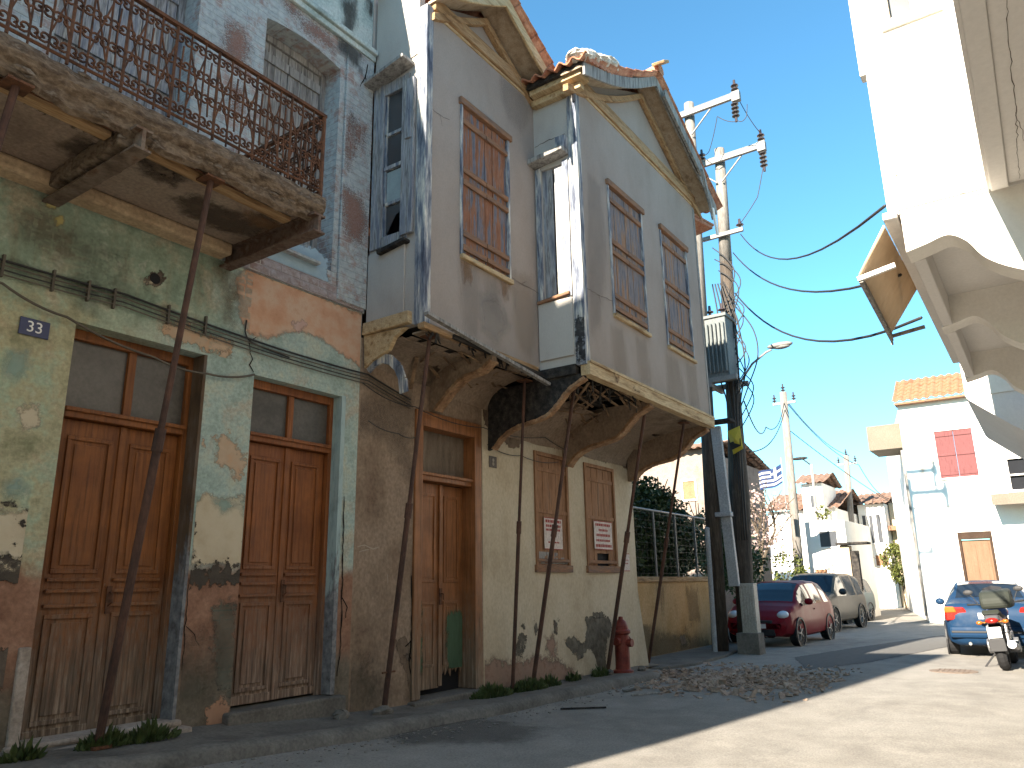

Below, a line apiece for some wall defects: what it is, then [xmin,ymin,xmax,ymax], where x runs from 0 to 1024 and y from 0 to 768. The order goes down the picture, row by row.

crack [1006,8,1024,179]
flaking render [344,113,370,173]
damp [138,159,273,236]
flaking render [342,184,369,248]
peeling [160,322,233,358]
peeling [235,270,362,367]
peeling [201,432,248,482]
peeling [0,500,29,584]
peeling [189,492,245,590]
crack [337,498,369,674]
peeling [485,611,612,688]
peeling [205,694,230,725]